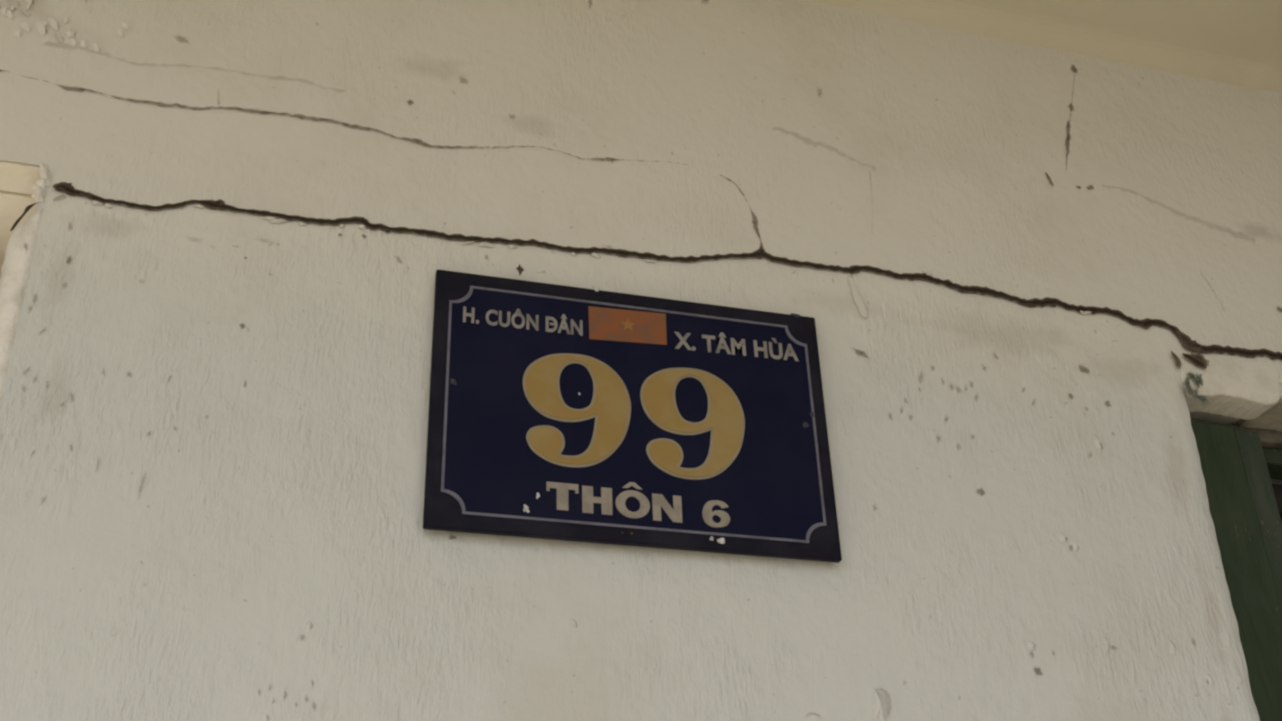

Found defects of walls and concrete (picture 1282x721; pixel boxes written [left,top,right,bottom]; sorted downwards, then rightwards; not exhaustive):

crack [47,81,640,161]
crack [1045,104,1094,190]
crack [10,175,1282,360]